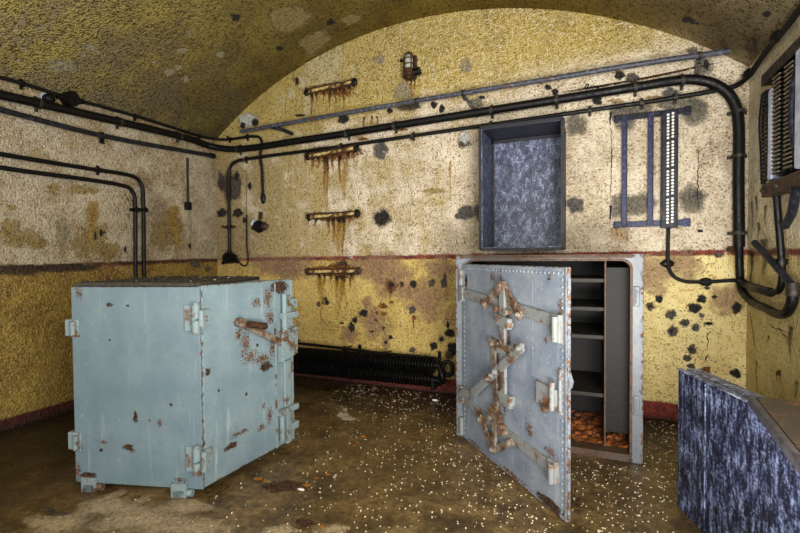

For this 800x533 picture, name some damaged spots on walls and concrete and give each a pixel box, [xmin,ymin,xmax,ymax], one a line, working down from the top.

corrosion [305,84,356,112]
corrosion [304,137,368,201]
leakage [0,183,121,276]
leakage [151,207,182,251]
corrosion [304,212,359,309]
leakage [644,259,670,290]